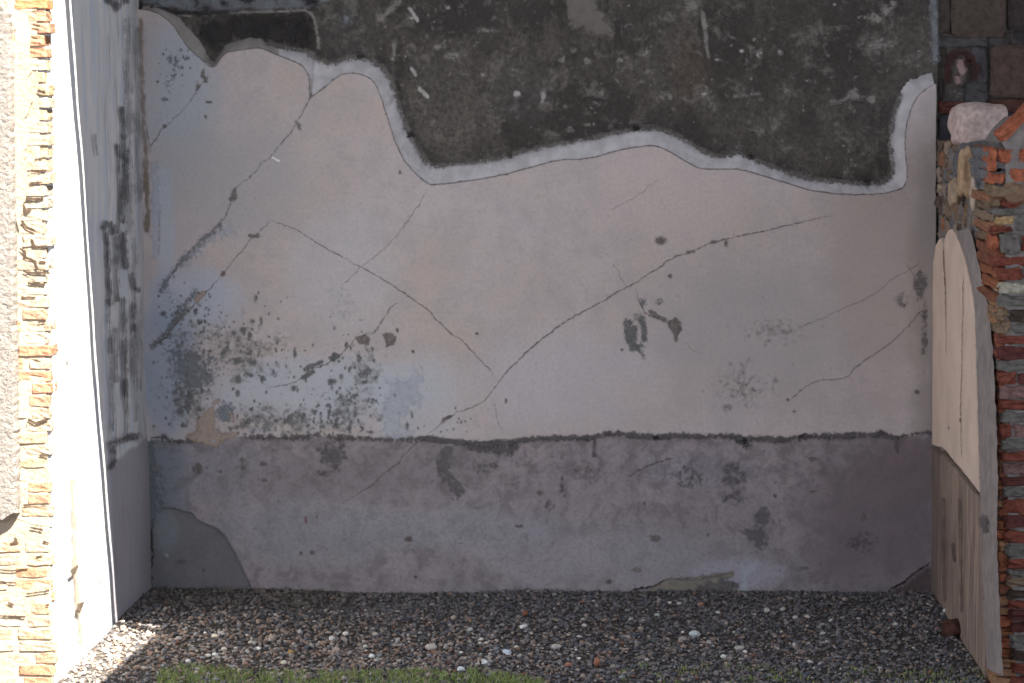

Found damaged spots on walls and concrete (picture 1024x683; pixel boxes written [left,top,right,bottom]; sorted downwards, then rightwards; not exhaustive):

crack [150,69,208,152]
spalling [139,0,939,196]
leakage [100,17,471,525]
crack [150,89,830,503]
leakage [621,298,647,356]
crack [786,252,963,458]
spalling [150,507,252,589]